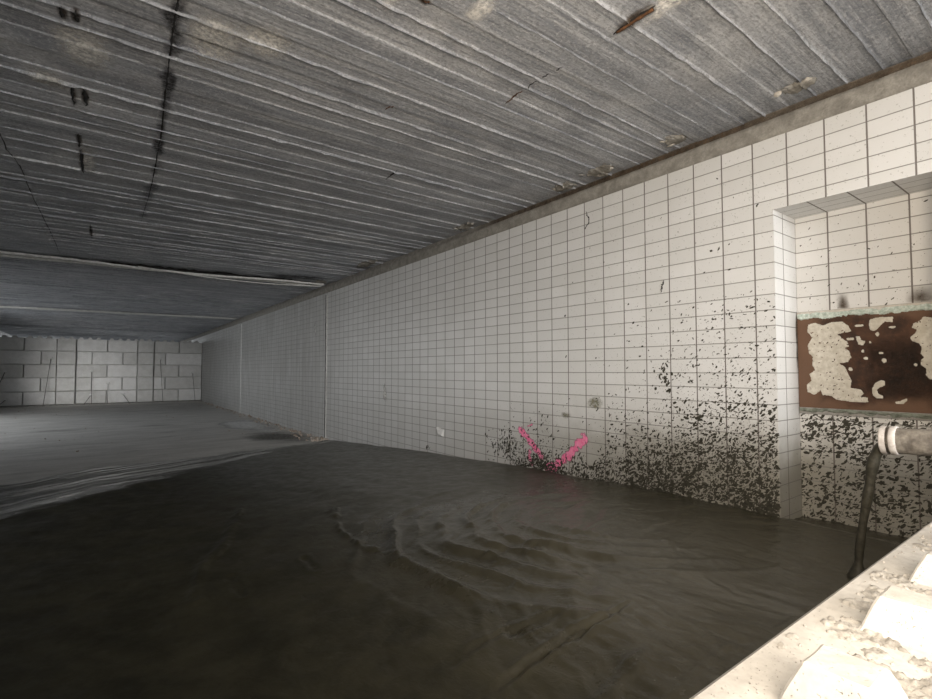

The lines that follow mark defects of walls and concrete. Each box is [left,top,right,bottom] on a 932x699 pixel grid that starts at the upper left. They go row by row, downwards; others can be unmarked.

corrosion [613,6,655,35]
crack [141,0,184,221]
crack [0,134,59,251]
corrosion [796,320,865,401]
corrosion [873,320,932,396]